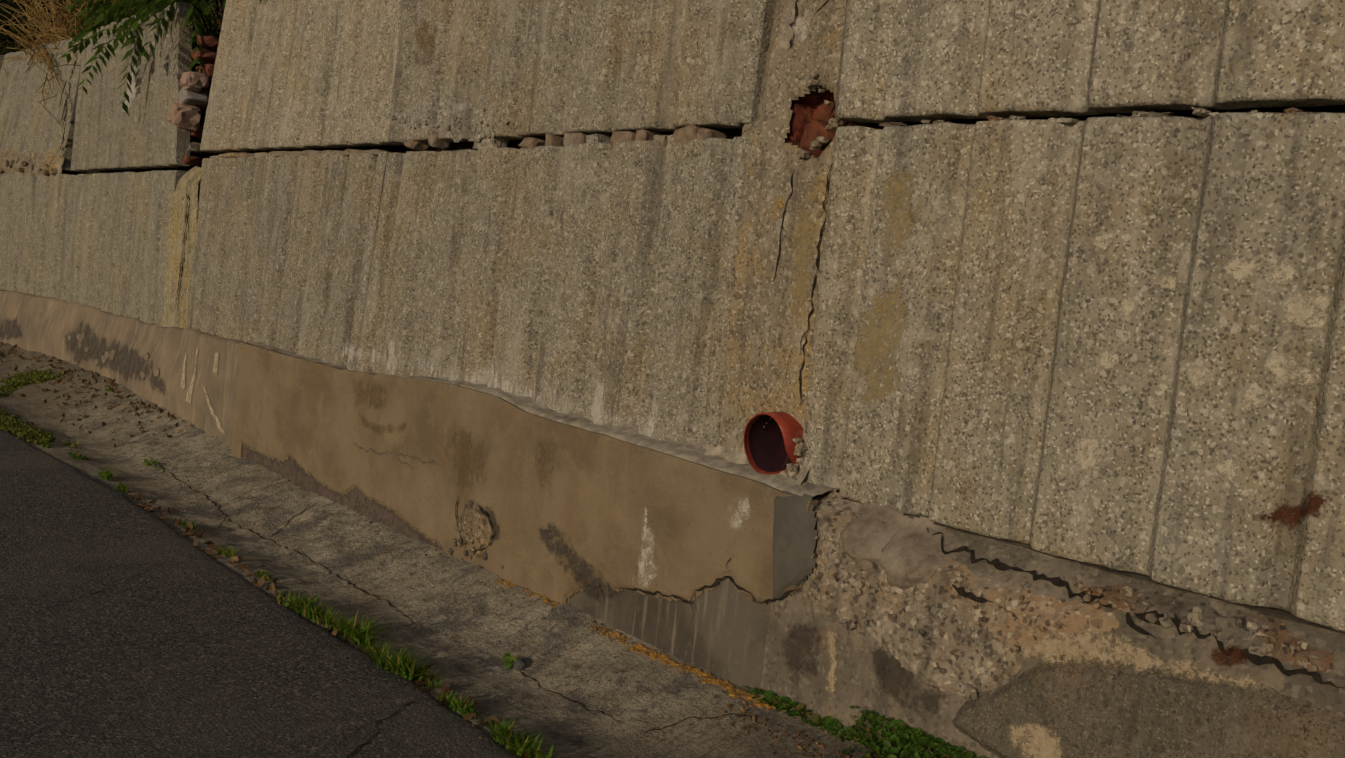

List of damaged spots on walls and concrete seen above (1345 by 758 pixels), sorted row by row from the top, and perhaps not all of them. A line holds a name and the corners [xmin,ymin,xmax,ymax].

spalling [784,72,881,158]
damp [639,508,657,586]
corrosion [1258,491,1326,530]
spalling [615,489,1334,700]
crack [927,527,1345,688]
crack [347,699,418,758]
crack [520,671,763,733]